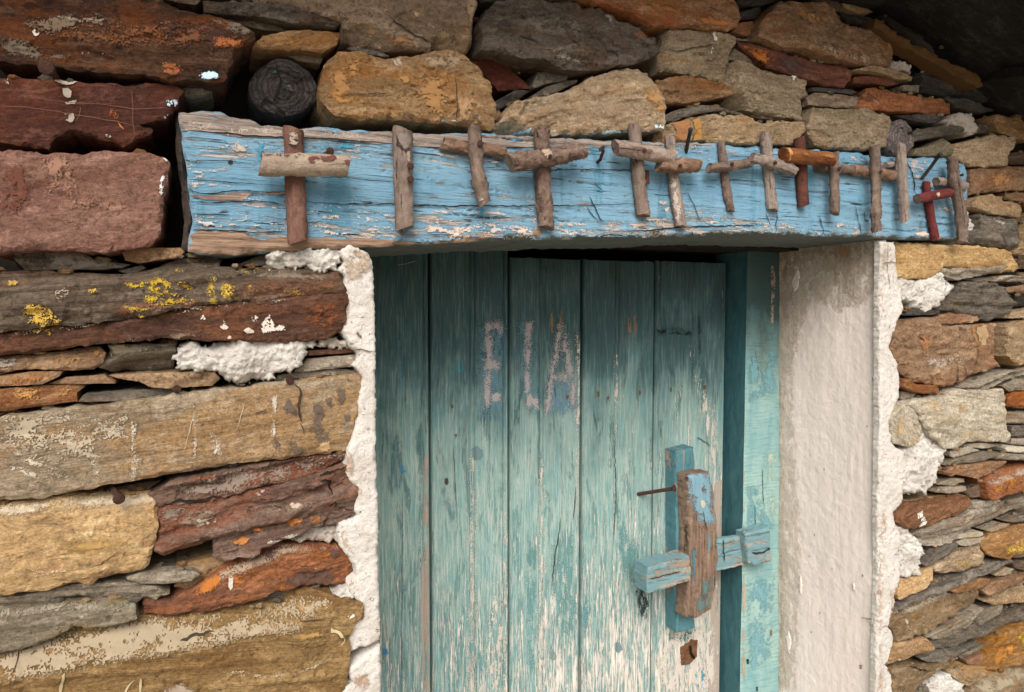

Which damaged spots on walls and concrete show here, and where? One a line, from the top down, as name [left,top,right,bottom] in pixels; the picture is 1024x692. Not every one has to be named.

peeling [407,95,489,163]
corrosion [659,118,702,143]
spalling [676,102,726,122]
peeling [178,112,897,270]